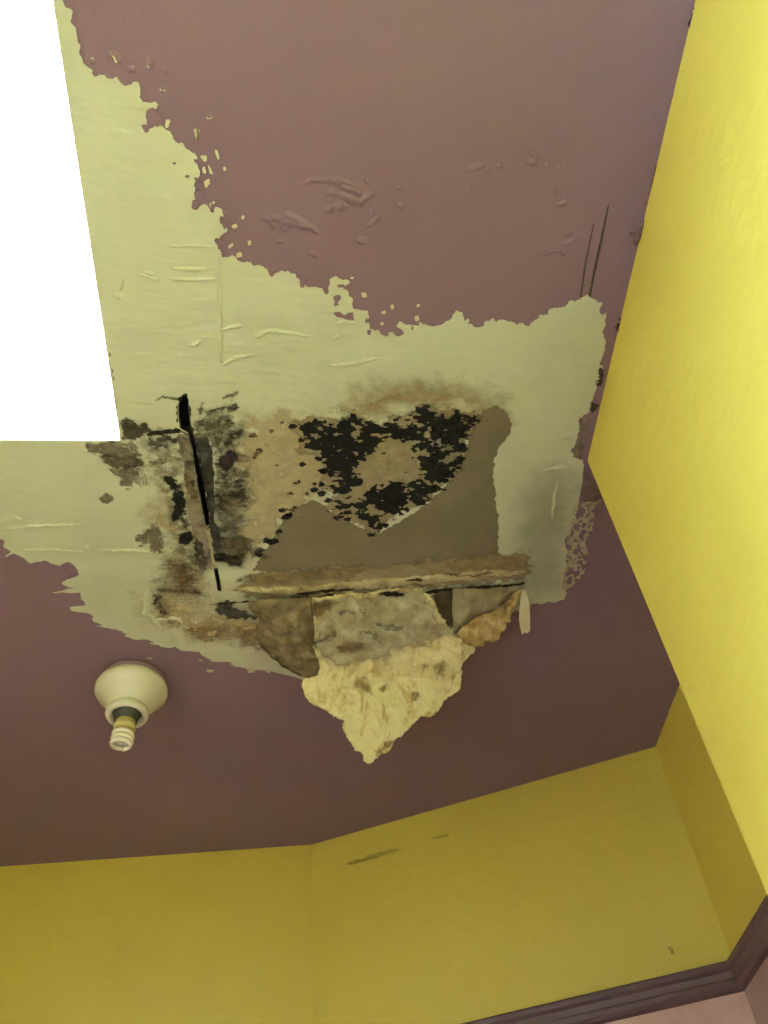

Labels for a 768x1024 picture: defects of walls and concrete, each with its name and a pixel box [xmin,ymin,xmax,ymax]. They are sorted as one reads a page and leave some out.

peeling [0,0,606,680]
crack [580,205,609,297]
crack [147,393,211,529]
damp [85,385,512,588]